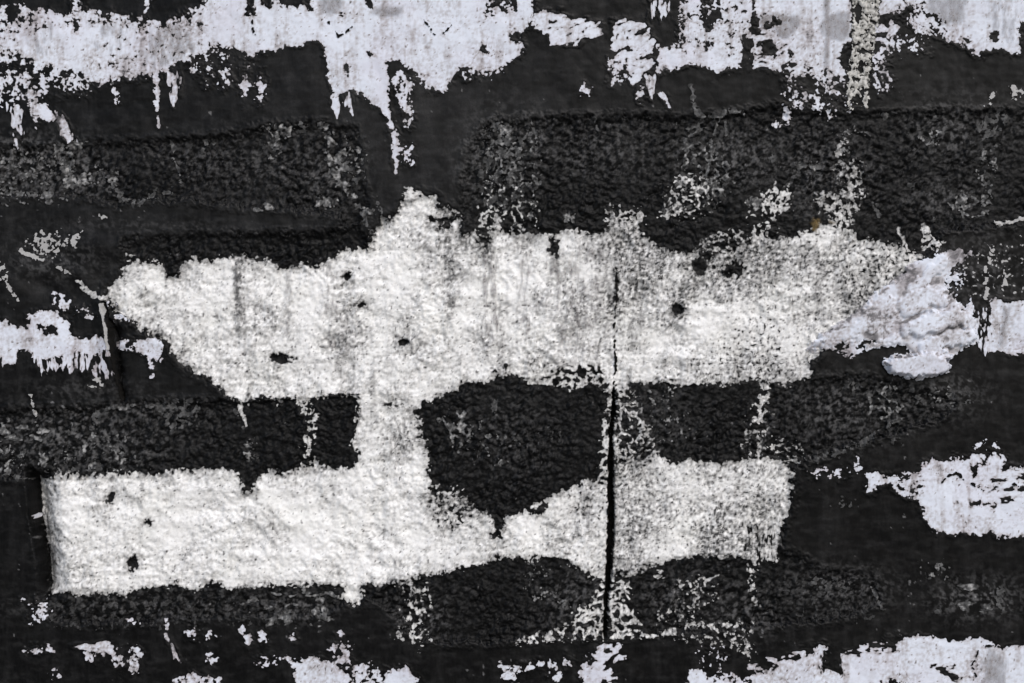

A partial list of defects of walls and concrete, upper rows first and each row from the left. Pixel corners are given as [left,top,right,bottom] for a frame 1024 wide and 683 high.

peeling [218,64,233,88]
peeling [238,74,267,107]
peeling [391,70,415,128]
peeling [607,0,854,99]
peeling [872,0,1024,94]
peeling [391,129,415,174]
peeling [52,291,71,311]
peeling [0,303,114,387]
crack [602,267,618,637]
peeling [810,466,842,480]
peeling [865,439,1024,539]
peeling [687,634,1024,683]